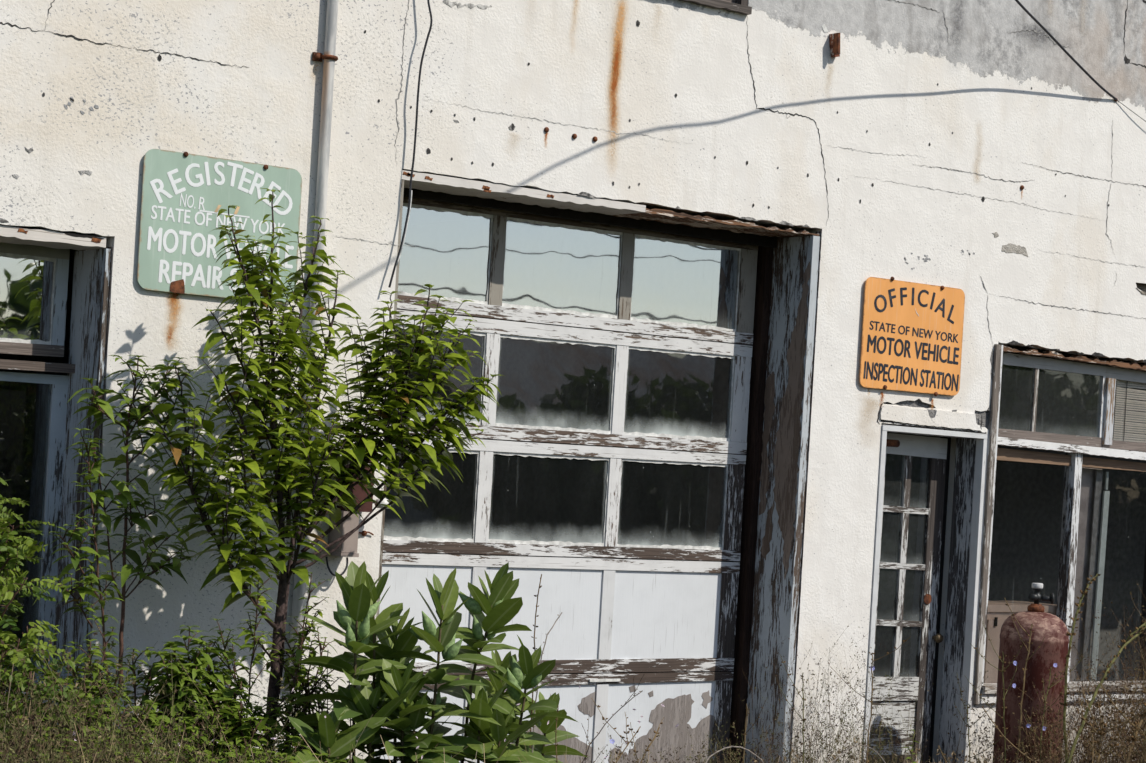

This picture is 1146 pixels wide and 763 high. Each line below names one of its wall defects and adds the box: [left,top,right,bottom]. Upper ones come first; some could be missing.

crack [0,0,249,68]
corrosion [609,2,625,140]
crack [746,16,1146,282]
corrosion [168,293,180,340]
crack [980,276,1146,343]
peeling [758,261,811,579]
peeling [526,725,593,763]
peeling [578,691,596,717]
peeling [608,685,713,763]